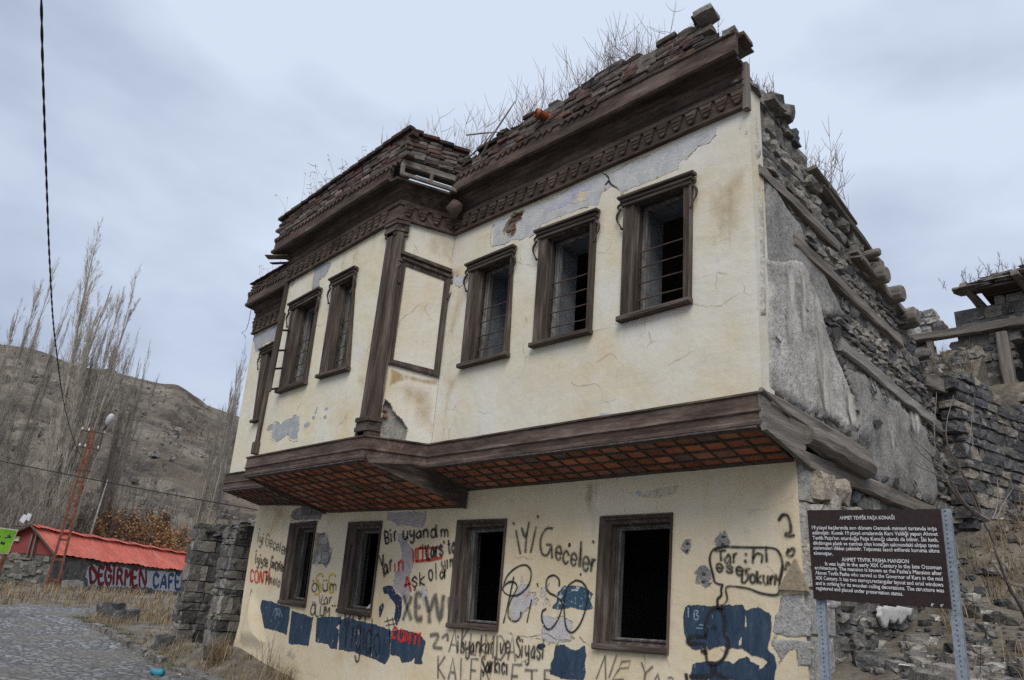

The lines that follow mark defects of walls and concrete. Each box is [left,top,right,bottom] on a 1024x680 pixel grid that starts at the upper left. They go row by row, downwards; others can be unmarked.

peeling [490,127,716,247]
peeling [268,407,328,444]
spalling [381,399,408,440]
spalling [290,506,332,568]
spalling [694,565,712,588]